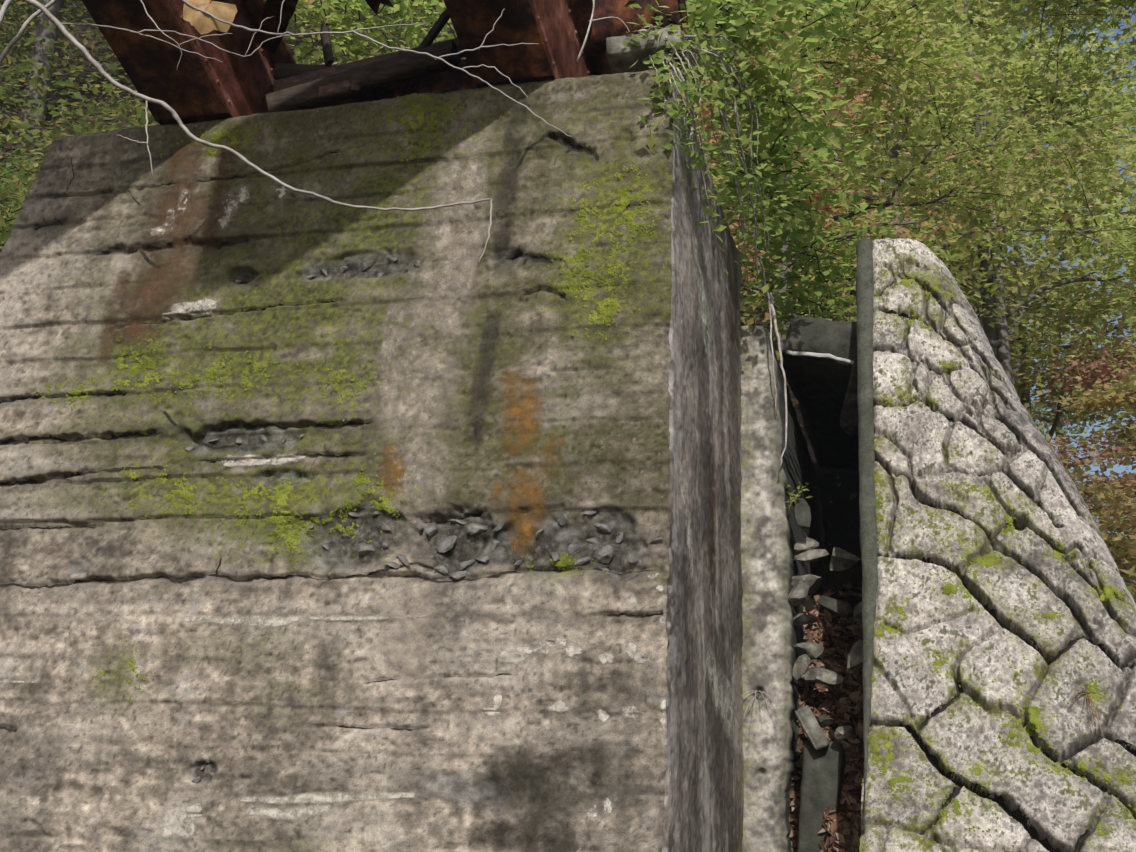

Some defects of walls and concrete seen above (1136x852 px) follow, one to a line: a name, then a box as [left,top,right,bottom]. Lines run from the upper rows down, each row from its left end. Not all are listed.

crack [0,392,129,404]
crack [0,411,374,463]
crack [0,465,166,487]
crack [0,524,102,532]
crack [423,507,561,524]
spalling [322,510,639,580]
crack [0,557,648,589]
leakage [491,745,605,802]
leakage [478,819,590,851]